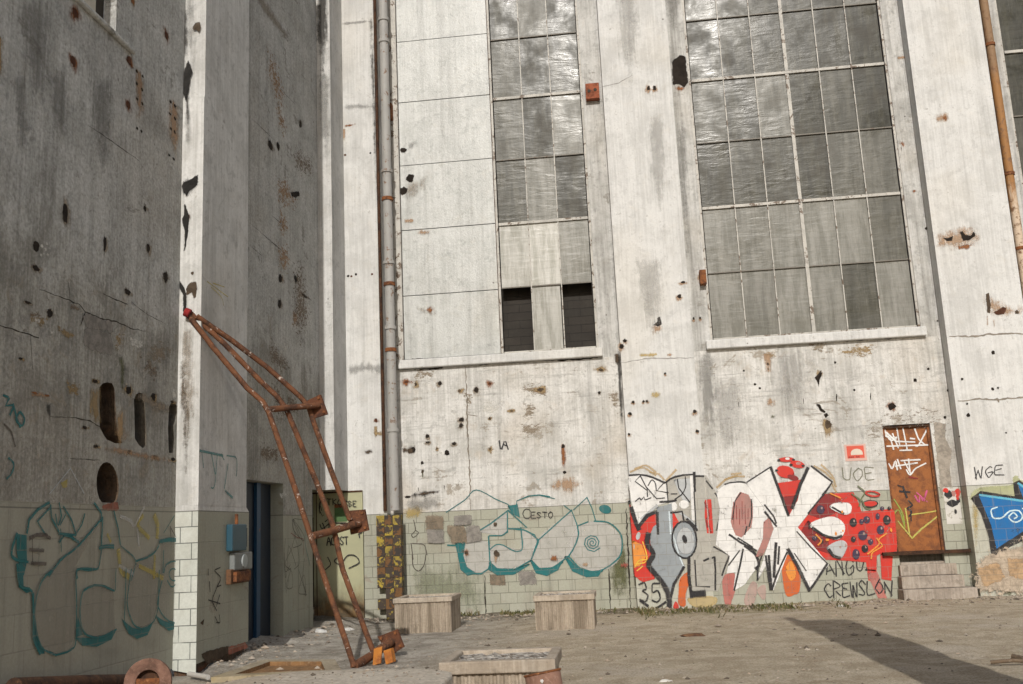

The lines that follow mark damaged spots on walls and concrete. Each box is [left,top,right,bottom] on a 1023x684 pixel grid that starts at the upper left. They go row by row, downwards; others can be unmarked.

crack [43,282,162,331]
corrosion [986,293,1020,325]
peeling [969,536,1023,596]